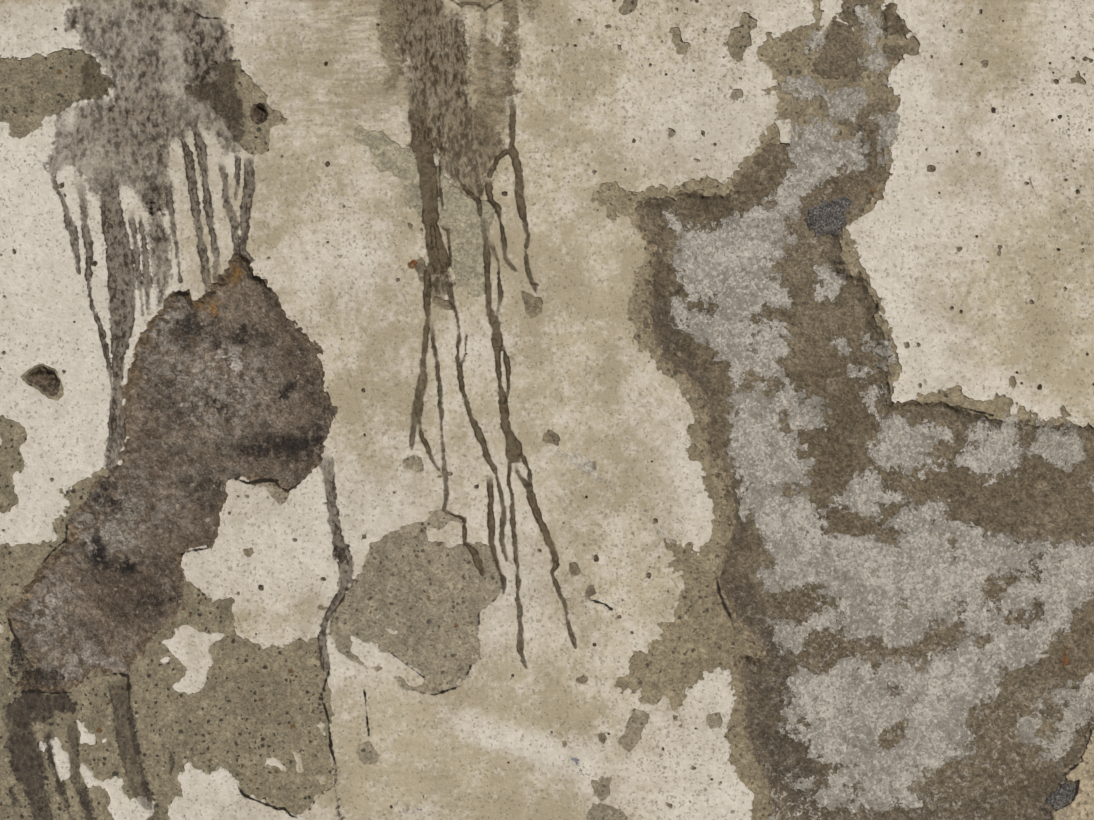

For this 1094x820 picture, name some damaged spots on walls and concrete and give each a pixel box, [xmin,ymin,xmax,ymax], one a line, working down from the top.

peeling [0,48,113,139]
damp [44,0,256,473]
damp [378,0,577,668]
spalling [587,0,1094,820]
damp [3,692,97,820]
damp [109,687,155,820]
crack [321,671,336,764]